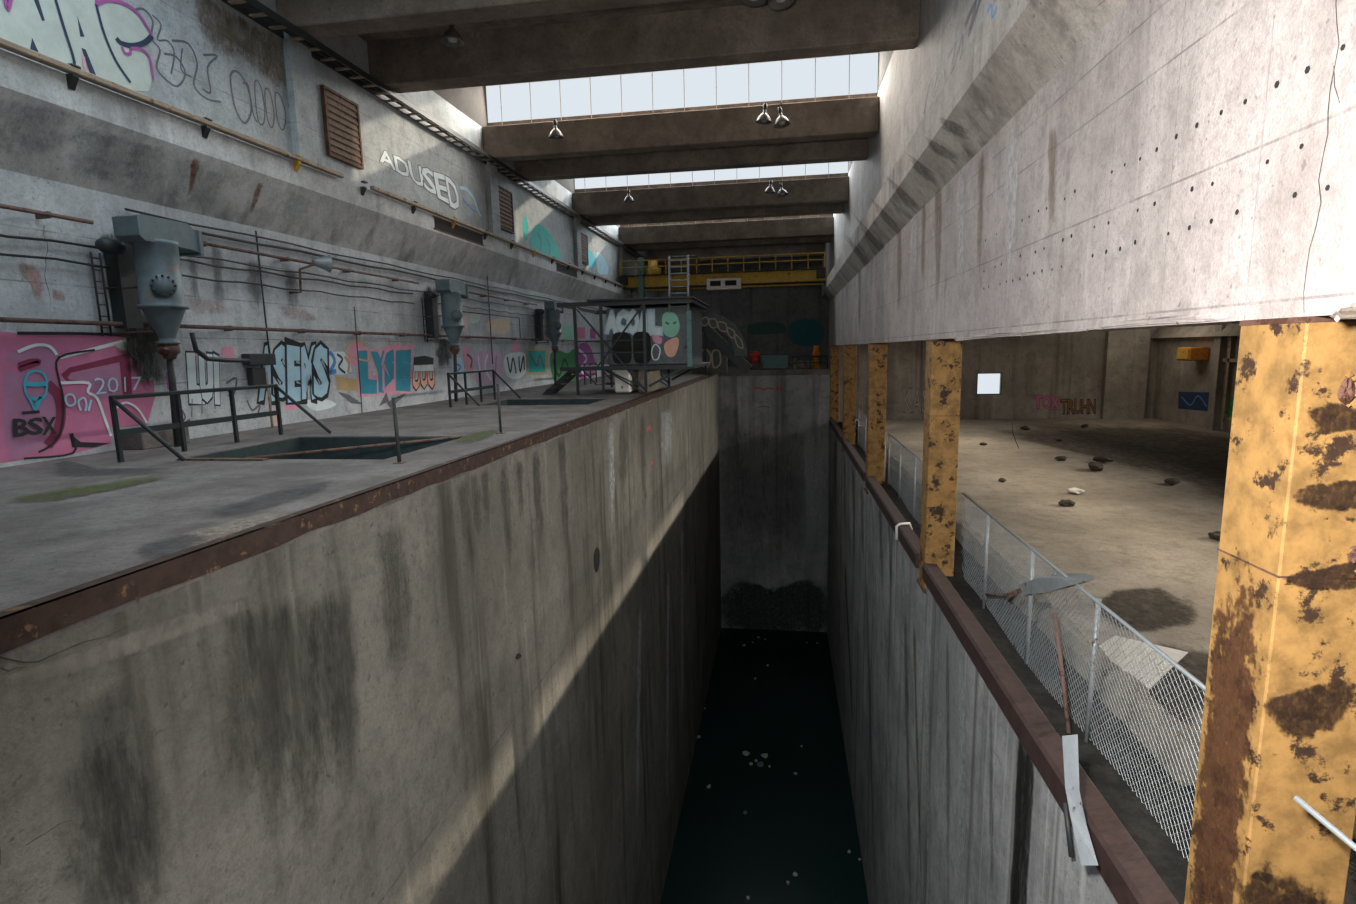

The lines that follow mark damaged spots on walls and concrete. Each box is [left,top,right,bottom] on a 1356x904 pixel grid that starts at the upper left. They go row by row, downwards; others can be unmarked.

crack [1303,0,1340,305]
rust [1294,480,1356,510]
rust [1310,402,1356,434]
rust [1191,561,1356,904]